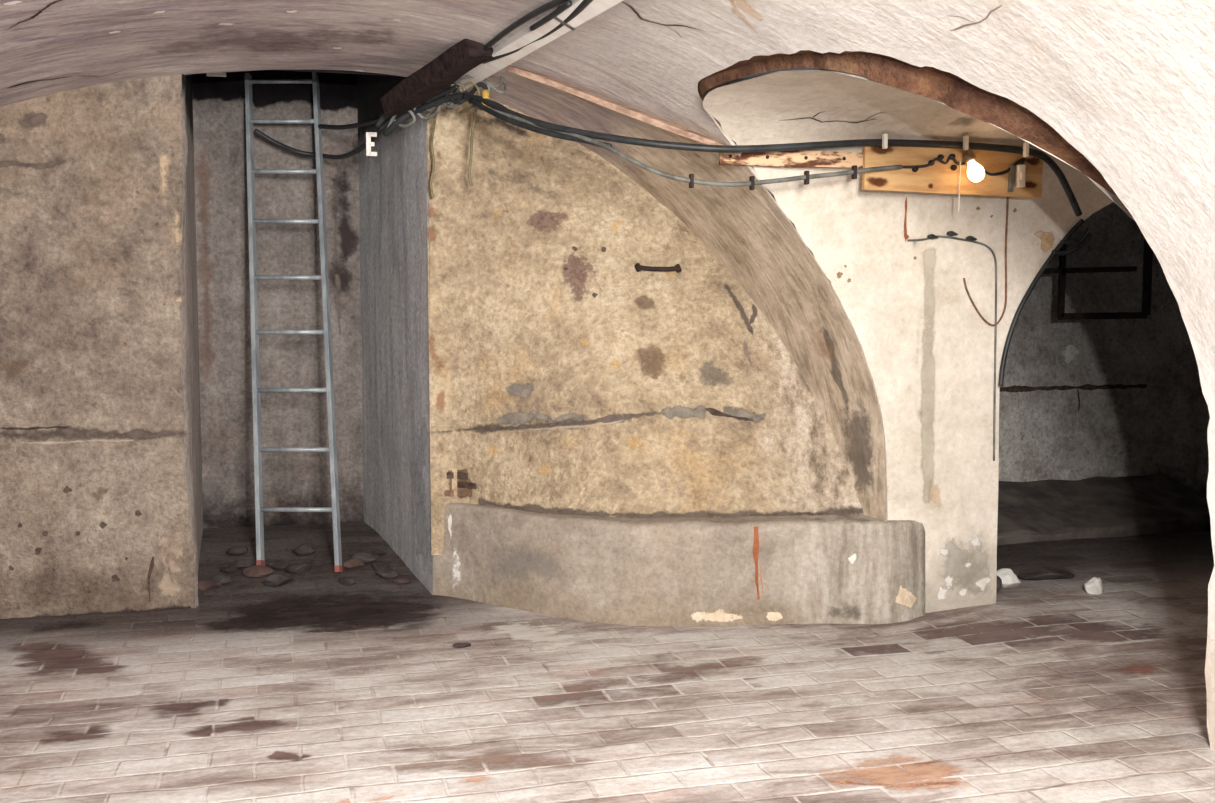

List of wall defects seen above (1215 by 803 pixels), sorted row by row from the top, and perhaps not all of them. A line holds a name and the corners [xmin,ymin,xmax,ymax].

crack [7,0,63,30]
crack [623,2,703,38]
crack [0,426,184,441]
crack [442,412,657,434]
crack [705,408,754,421]
corrosion [753,527,763,600]
spalling [691,609,743,623]
spalling [766,612,783,621]